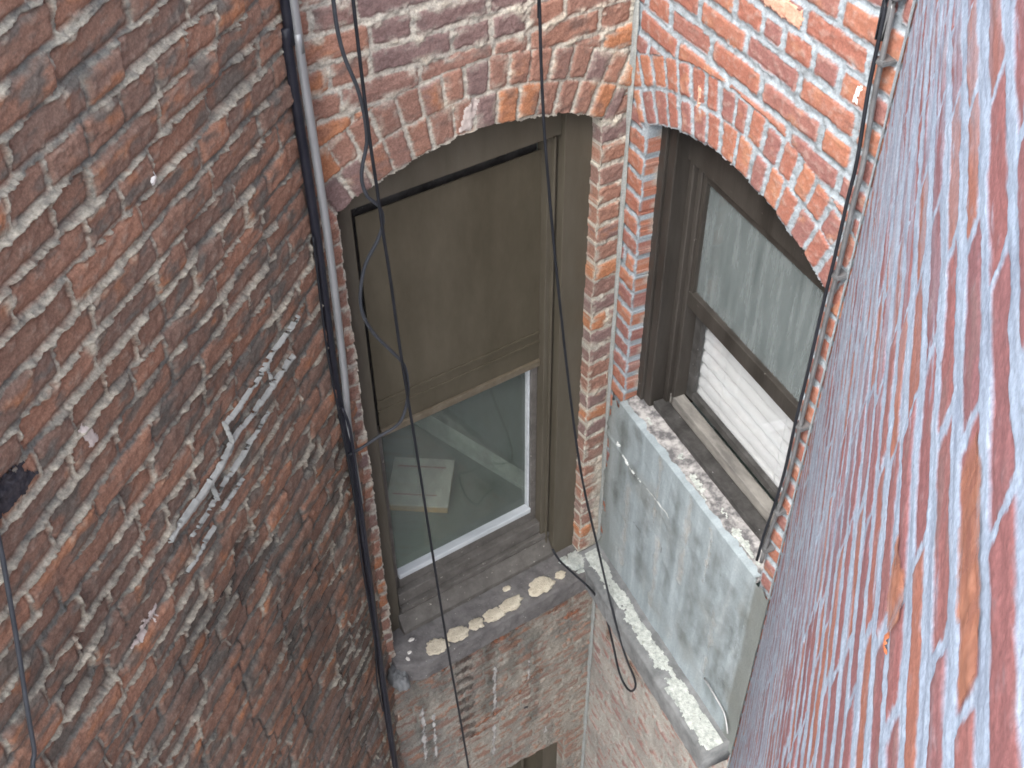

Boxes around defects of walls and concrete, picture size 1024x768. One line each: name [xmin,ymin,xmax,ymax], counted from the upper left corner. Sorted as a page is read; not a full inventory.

spalling [0,461,39,519]